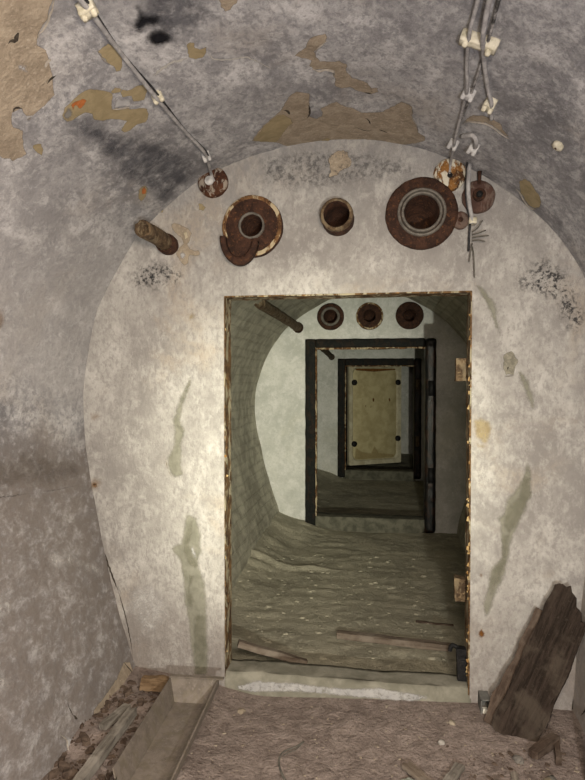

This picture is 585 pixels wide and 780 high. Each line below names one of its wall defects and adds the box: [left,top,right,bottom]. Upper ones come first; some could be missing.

peeling [0,0,57,161]
peeling [62,85,148,132]
peeling [295,34,378,94]
peeling [252,92,425,146]
corrosion [222,195,282,256]
corrosion [320,198,353,232]
mould [523,265,580,324]
damp [166,381,190,476]
damp [484,469,530,614]
damp [173,516,207,674]